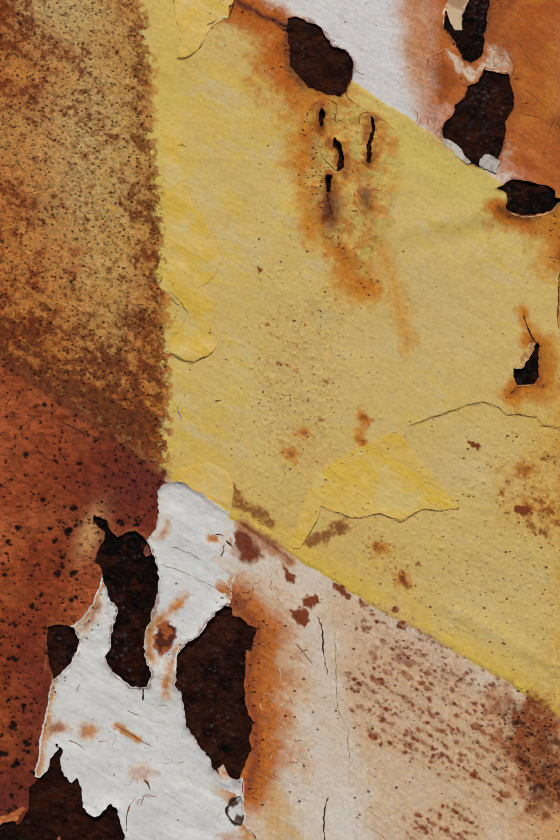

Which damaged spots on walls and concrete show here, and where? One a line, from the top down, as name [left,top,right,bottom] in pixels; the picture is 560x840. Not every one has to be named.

peeling [282,17,353,97]
peeling [413,0,560,218]
corrosion [0,0,181,825]
corrosion [203,0,560,840]
crack [409,387,560,429]
peeling [513,343,539,386]
crack [302,507,458,546]
peeling [0,462,257,840]
corrosion [111,585,217,707]